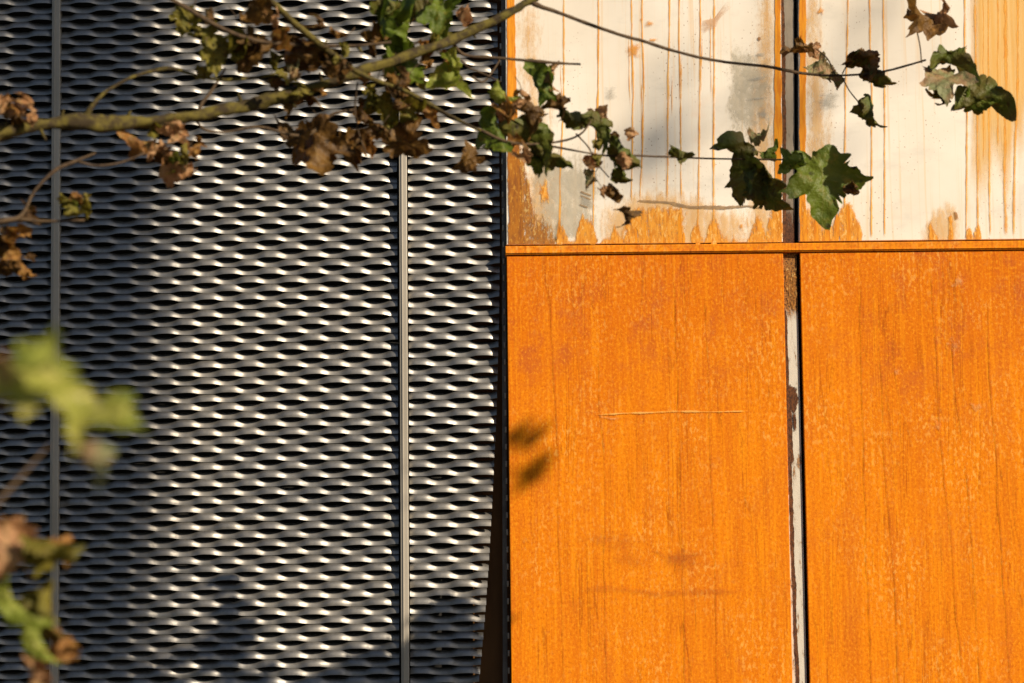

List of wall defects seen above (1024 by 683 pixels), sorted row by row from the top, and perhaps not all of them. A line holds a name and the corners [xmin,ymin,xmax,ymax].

rust [507,0,824,245]
rust [799,83,886,241]
rust [869,0,885,70]
rust [929,0,1024,240]
rust [784,267,800,683]